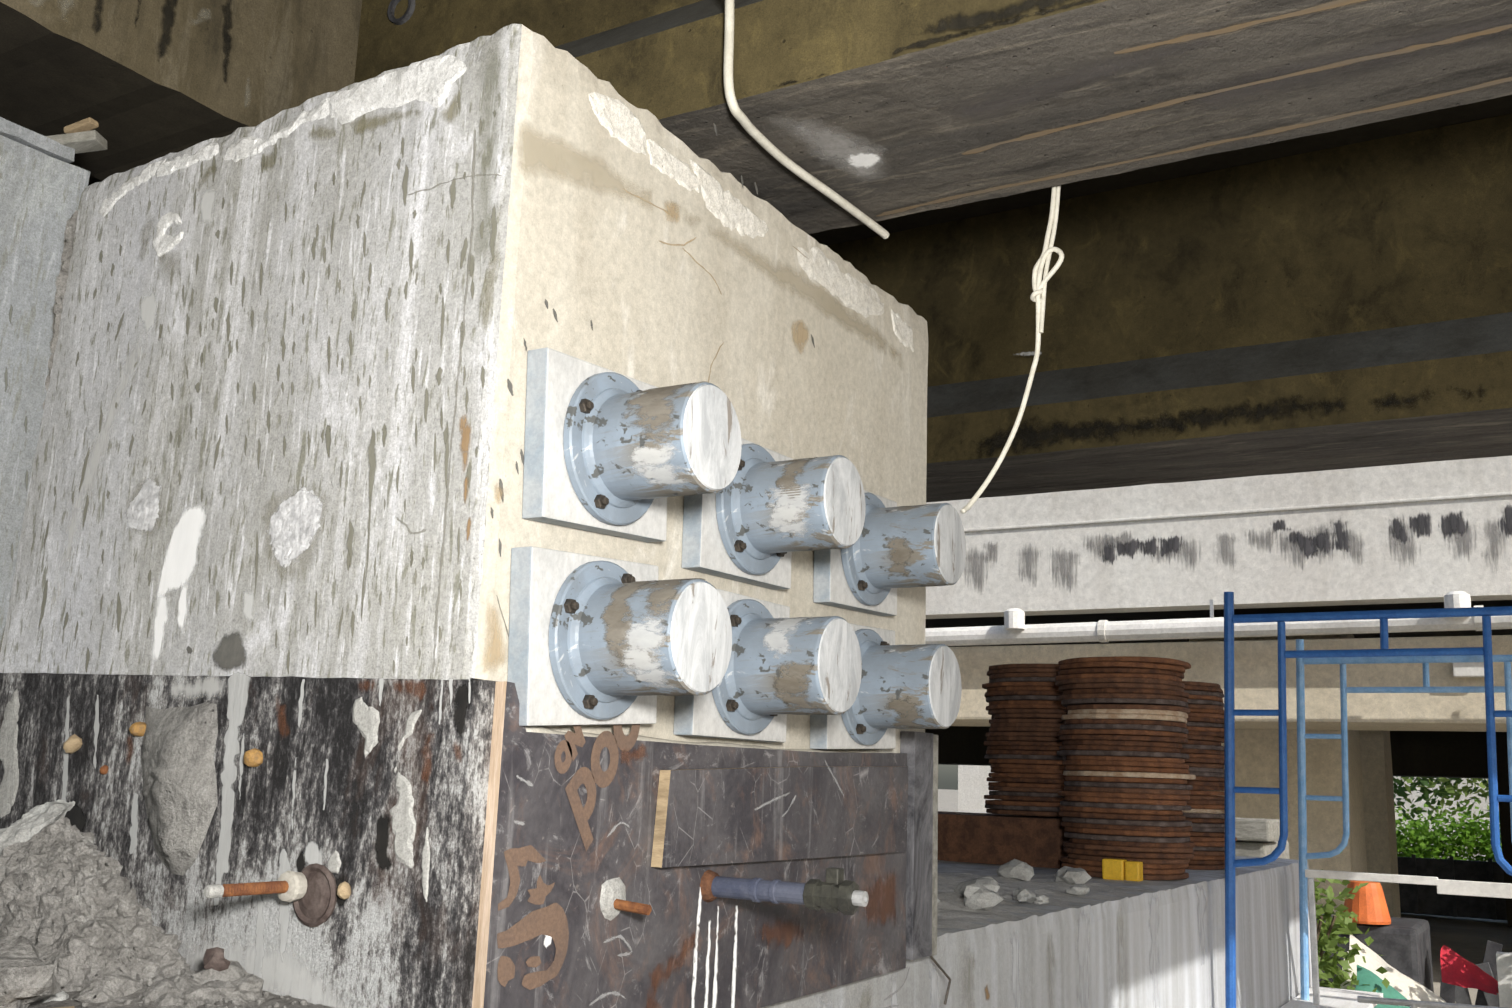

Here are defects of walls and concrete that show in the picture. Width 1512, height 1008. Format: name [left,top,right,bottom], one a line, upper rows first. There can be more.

peeling [98,55,467,217]
peeling [588,92,769,239]
peeling [797,247,914,352]
water stain [979,398,1344,457]
peeling [0,689,20,818]
water stain [172,633,251,906]
water stain [275,630,305,830]
water stain [278,841,322,878]
peeling [353,697,380,757]
peeling [389,709,430,902]
water stain [439,679,471,725]
rust [866,876,895,923]